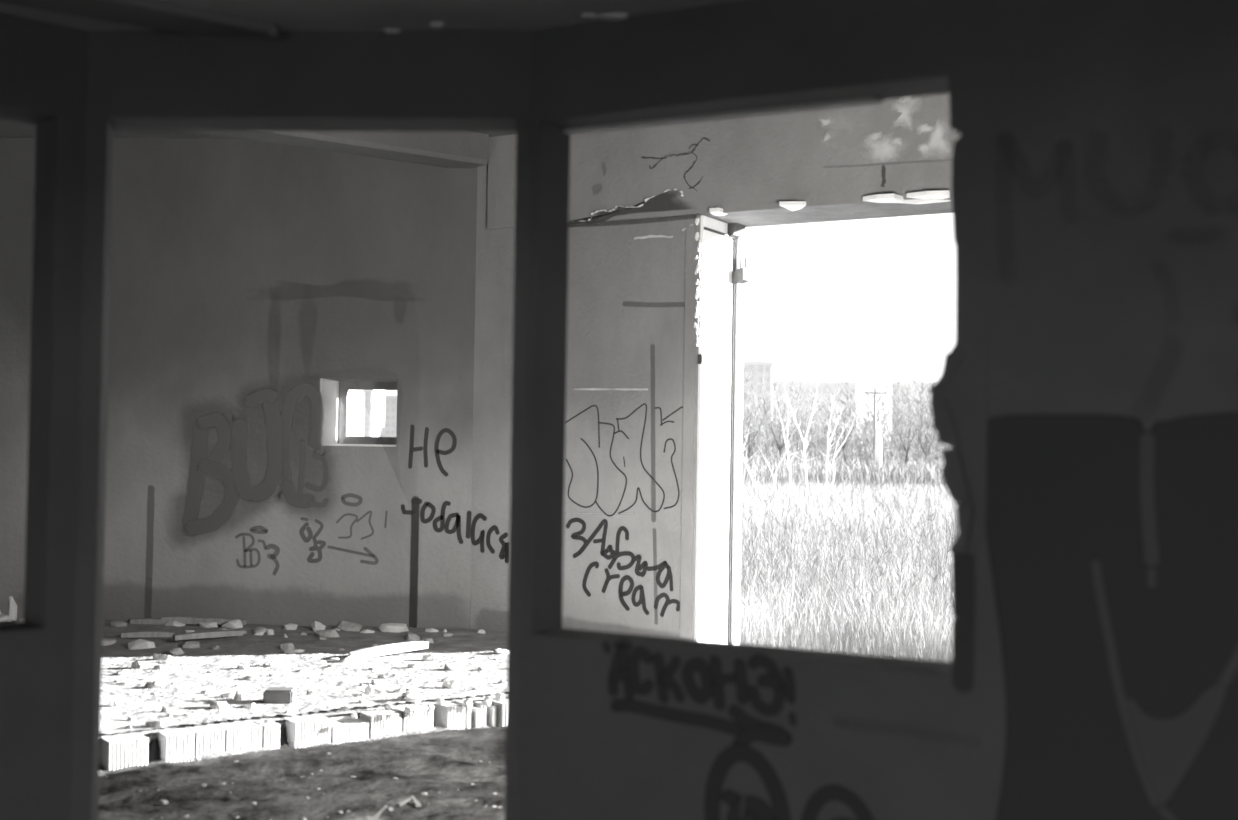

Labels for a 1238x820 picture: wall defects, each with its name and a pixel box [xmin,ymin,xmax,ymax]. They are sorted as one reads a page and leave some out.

crack [641,137,710,191]
spalling [570,189,727,639]
spalling [929,338,988,555]